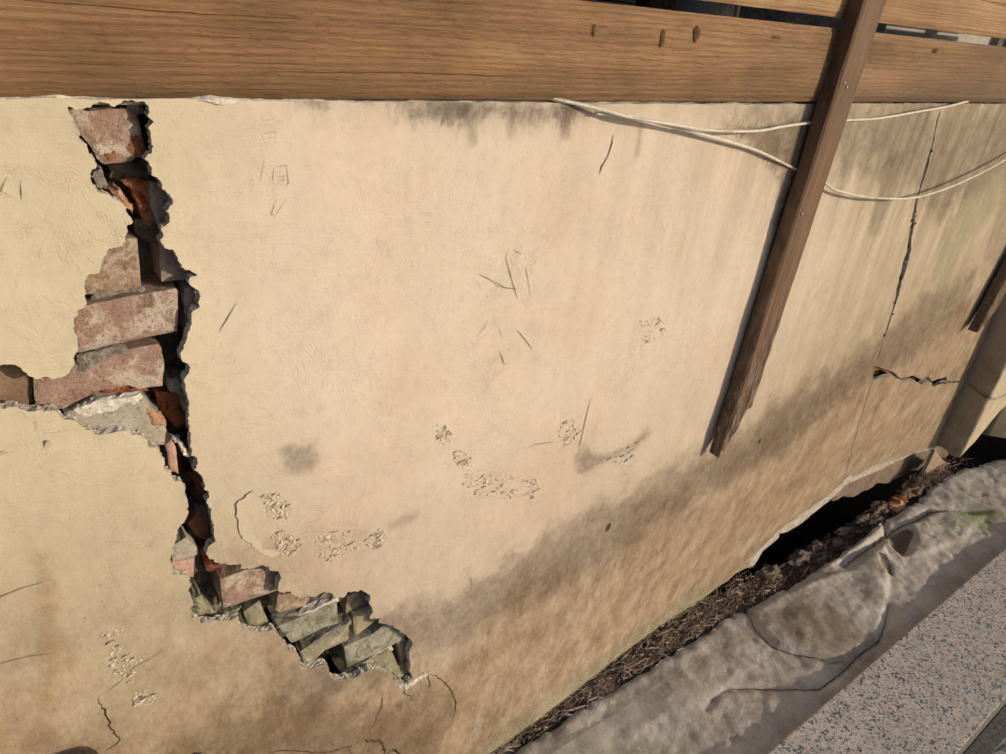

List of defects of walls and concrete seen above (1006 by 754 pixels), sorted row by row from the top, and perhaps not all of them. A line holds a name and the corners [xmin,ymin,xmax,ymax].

crack [883,209,917,337]
crack [0,105,457,754]
spalling [943,433,1006,474]
flaking render [236,490,388,562]
spalling [707,466,924,596]
leakage [750,455,910,565]
peeling [101,626,156,707]
crack [707,606,889,708]